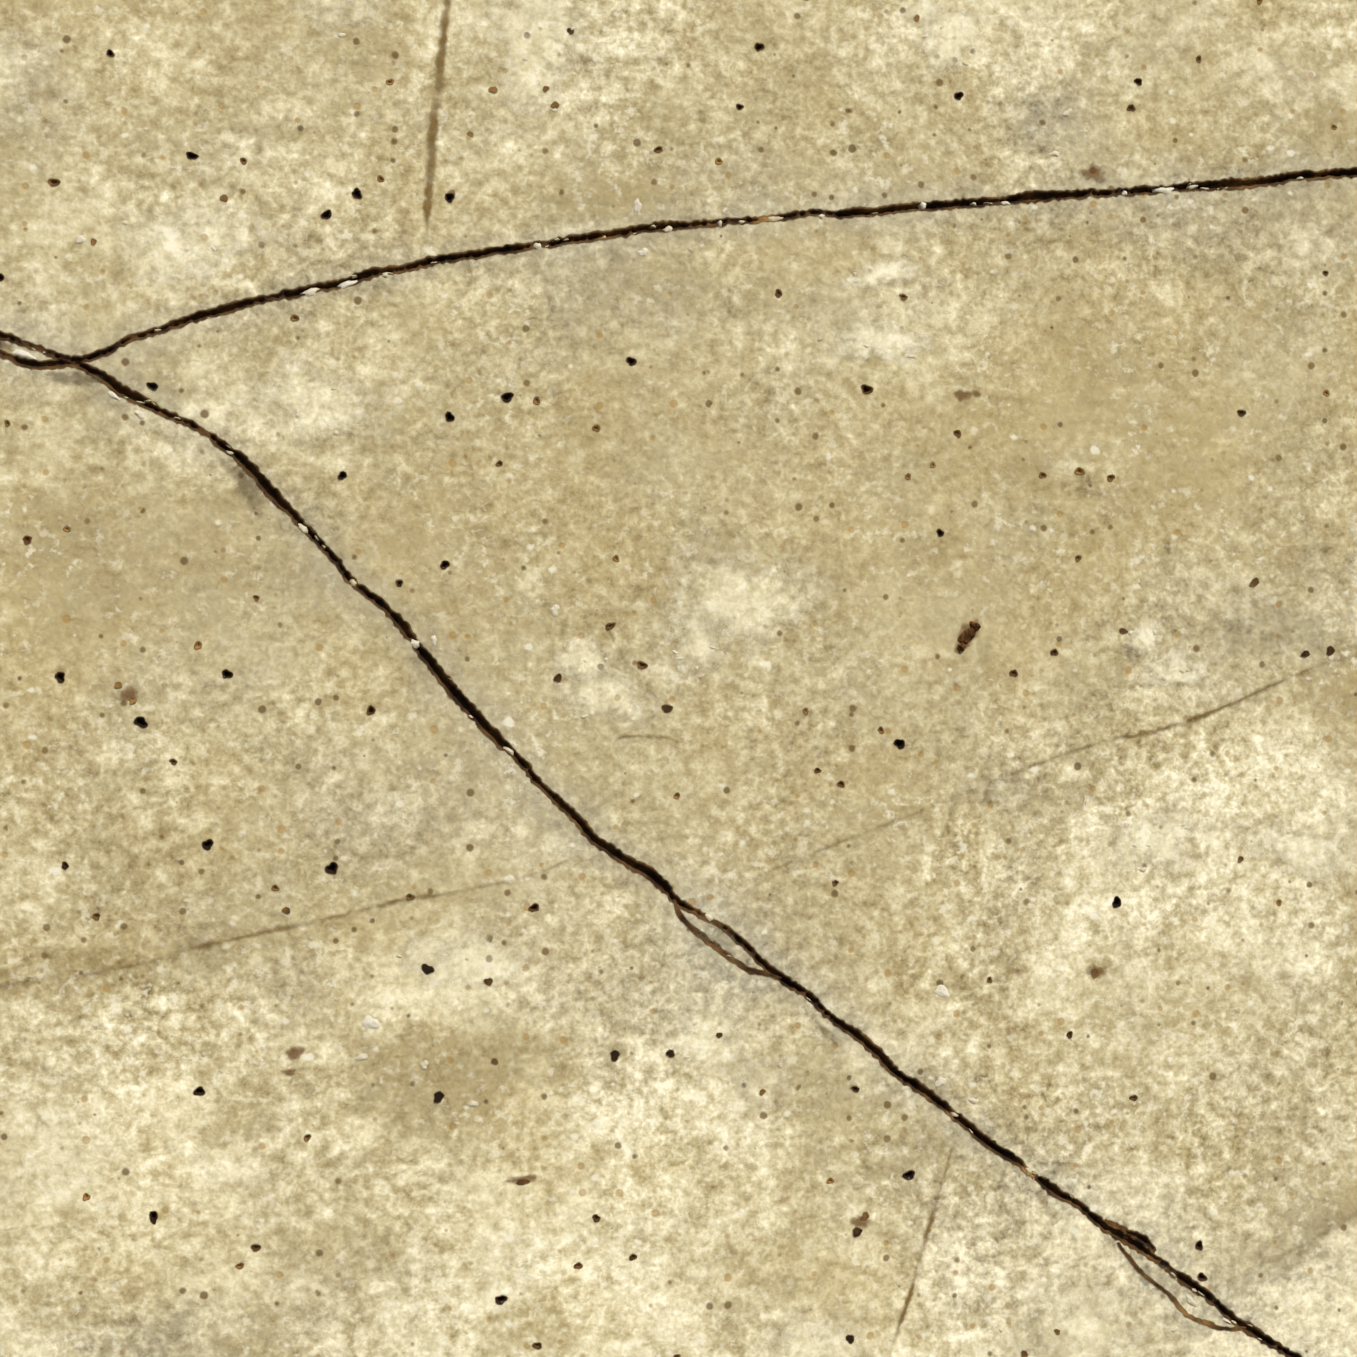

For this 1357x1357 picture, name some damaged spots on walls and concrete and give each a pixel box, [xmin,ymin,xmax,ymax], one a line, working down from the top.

crack [0,167,1357,366]
crack [0,349,1302,1357]